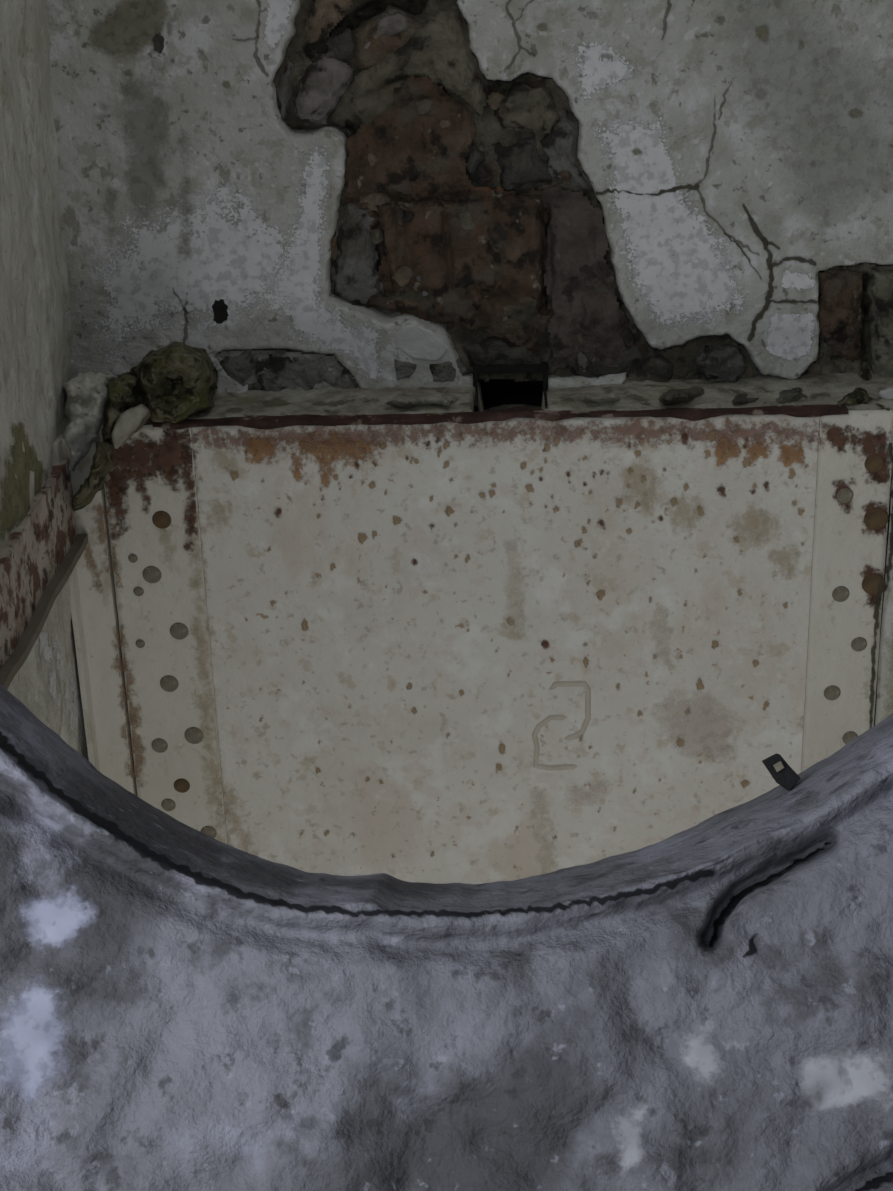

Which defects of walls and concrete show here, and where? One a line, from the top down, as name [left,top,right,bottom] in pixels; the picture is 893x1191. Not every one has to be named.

water stain [91,0,167,55]
crack [233,0,269,77]
spalling [273,0,760,408]
crack [595,84,821,342]
spalling [216,349,359,393]
spalling [776,262,893,411]
corrosion [85,418,893,591]
corrosion [861,565,884,609]
corrosion [114,626,145,785]